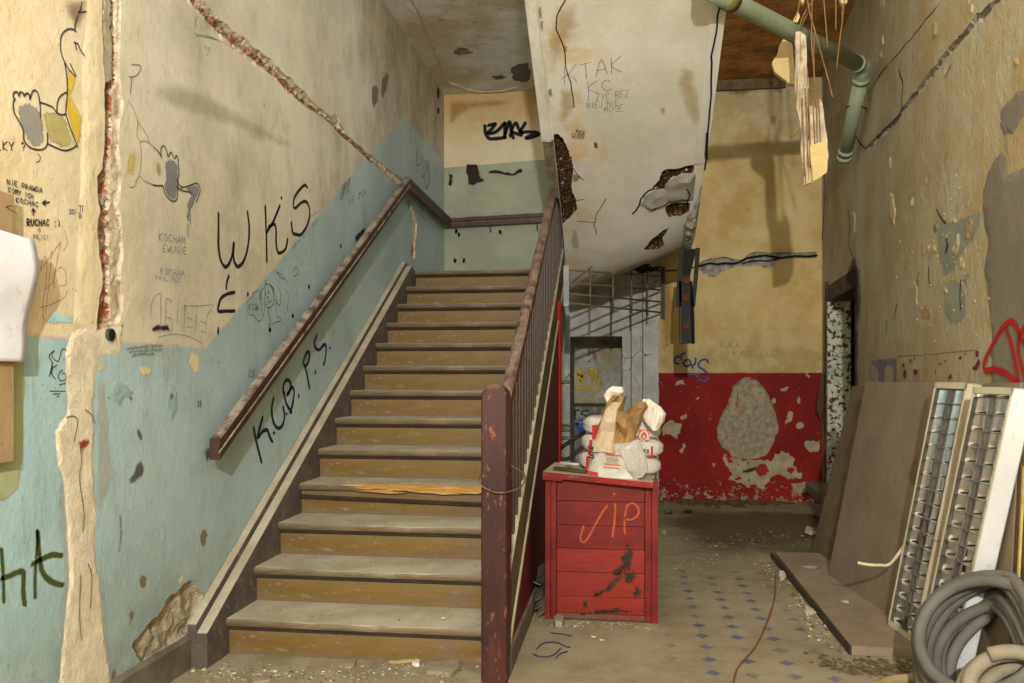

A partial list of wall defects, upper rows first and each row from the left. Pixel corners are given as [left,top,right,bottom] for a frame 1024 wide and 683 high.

crack [556,0,574,105]
crack [856,0,942,149]
spalling [554,134,577,224]
spalling [644,191,701,250]
spalling [653,151,705,190]
crack [656,178,852,277]
peeling [886,170,980,378]
peeling [662,414,687,453]
spalling [712,377,806,494]
peeling [804,441,820,452]
spalling [132,575,203,662]